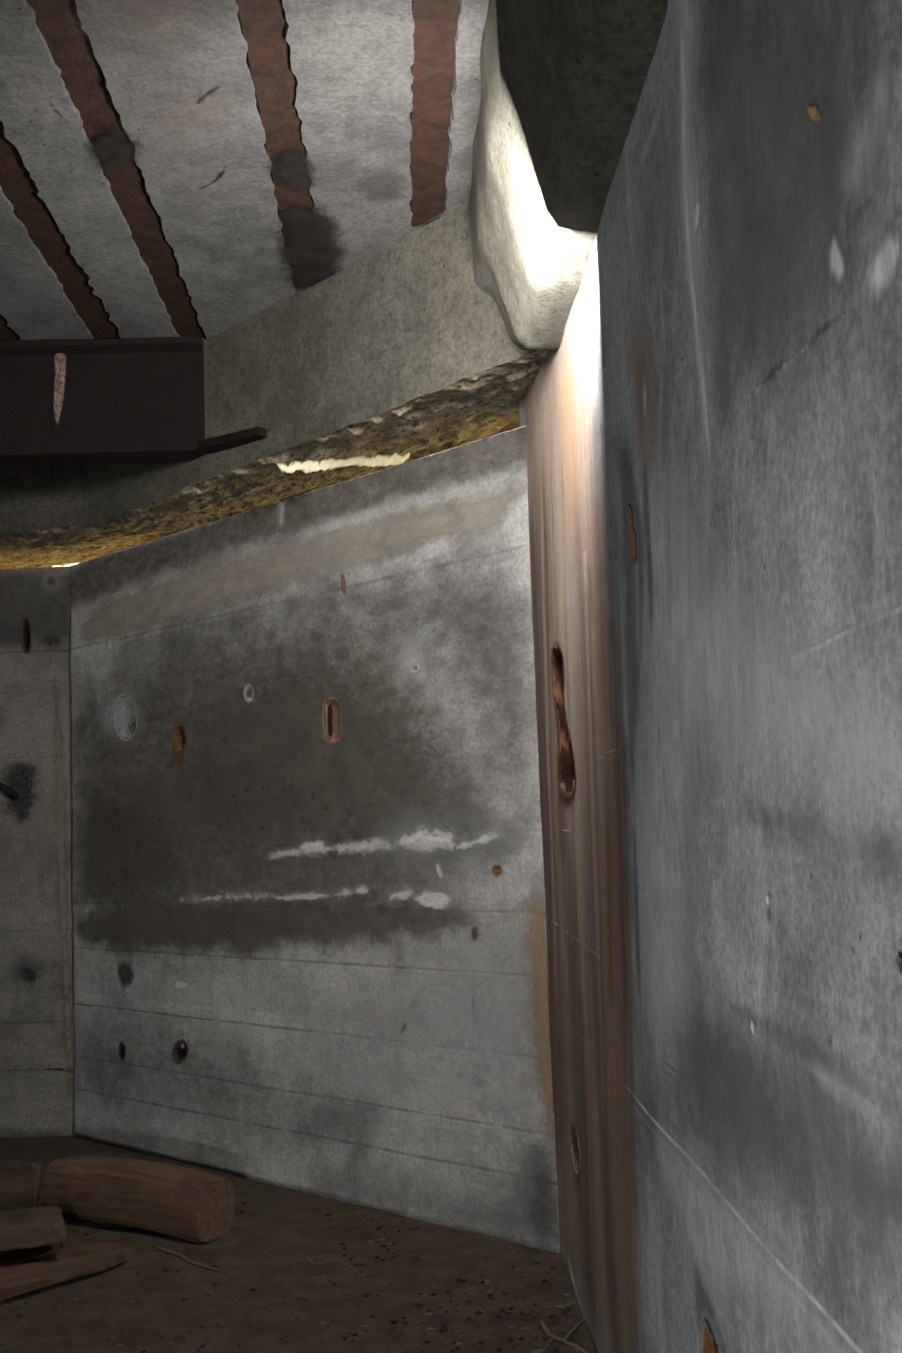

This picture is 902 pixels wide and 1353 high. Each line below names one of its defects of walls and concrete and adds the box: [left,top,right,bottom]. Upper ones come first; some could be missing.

leakage [2,763,36,822]
leakage [77,606,505,950]
leakage [357,573,526,751]
corrosion [524,340,637,1353]